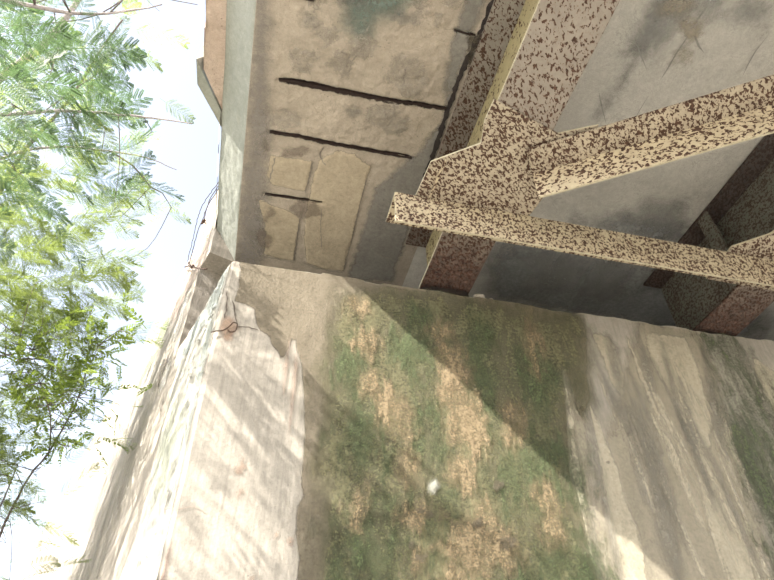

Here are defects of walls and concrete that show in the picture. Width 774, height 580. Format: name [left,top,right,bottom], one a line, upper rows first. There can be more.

crack [305,147,326,192]
crack [261,171,370,273]
peeling [259,130,412,271]
water stain [235,0,774,580]
water stain [125,265,230,580]